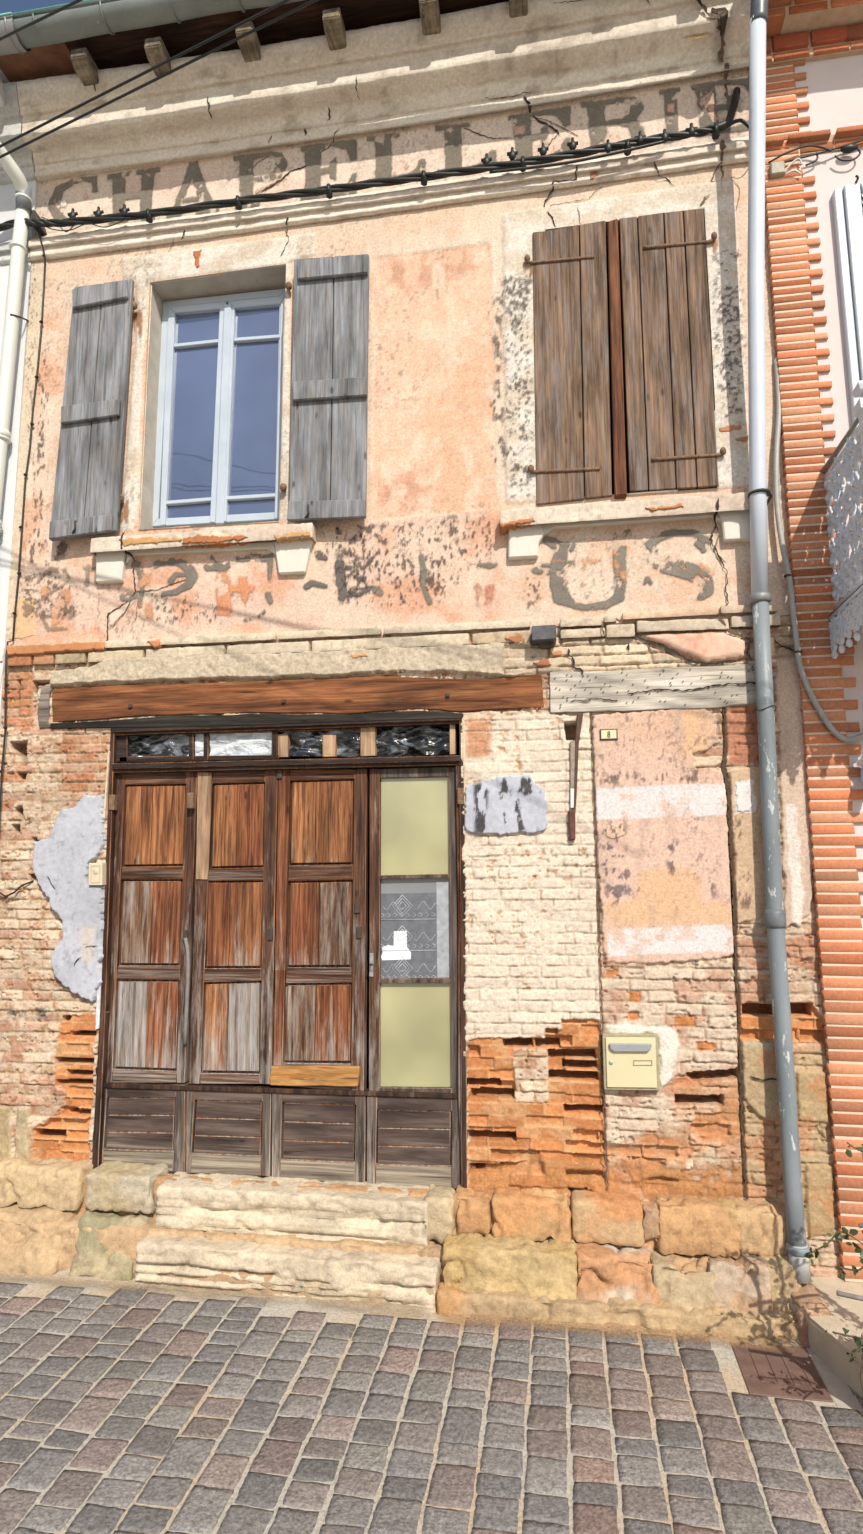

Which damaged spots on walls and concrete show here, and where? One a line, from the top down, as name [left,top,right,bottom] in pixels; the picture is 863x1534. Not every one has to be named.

crack [697,0,729,98]
crack [464,92,602,227]
crack [654,140,726,206]
peeling [504,276,534,497]
peeling [713,253,749,442]
spalling [119,534,253,552]
peeling [274,516,536,605]
peeling [6,585,109,656]
spalling [737,1002,774,1042]
spalling [790,1003,823,1045]
spalling [9,1008,97,1162]
spalling [467,1019,743,1199]